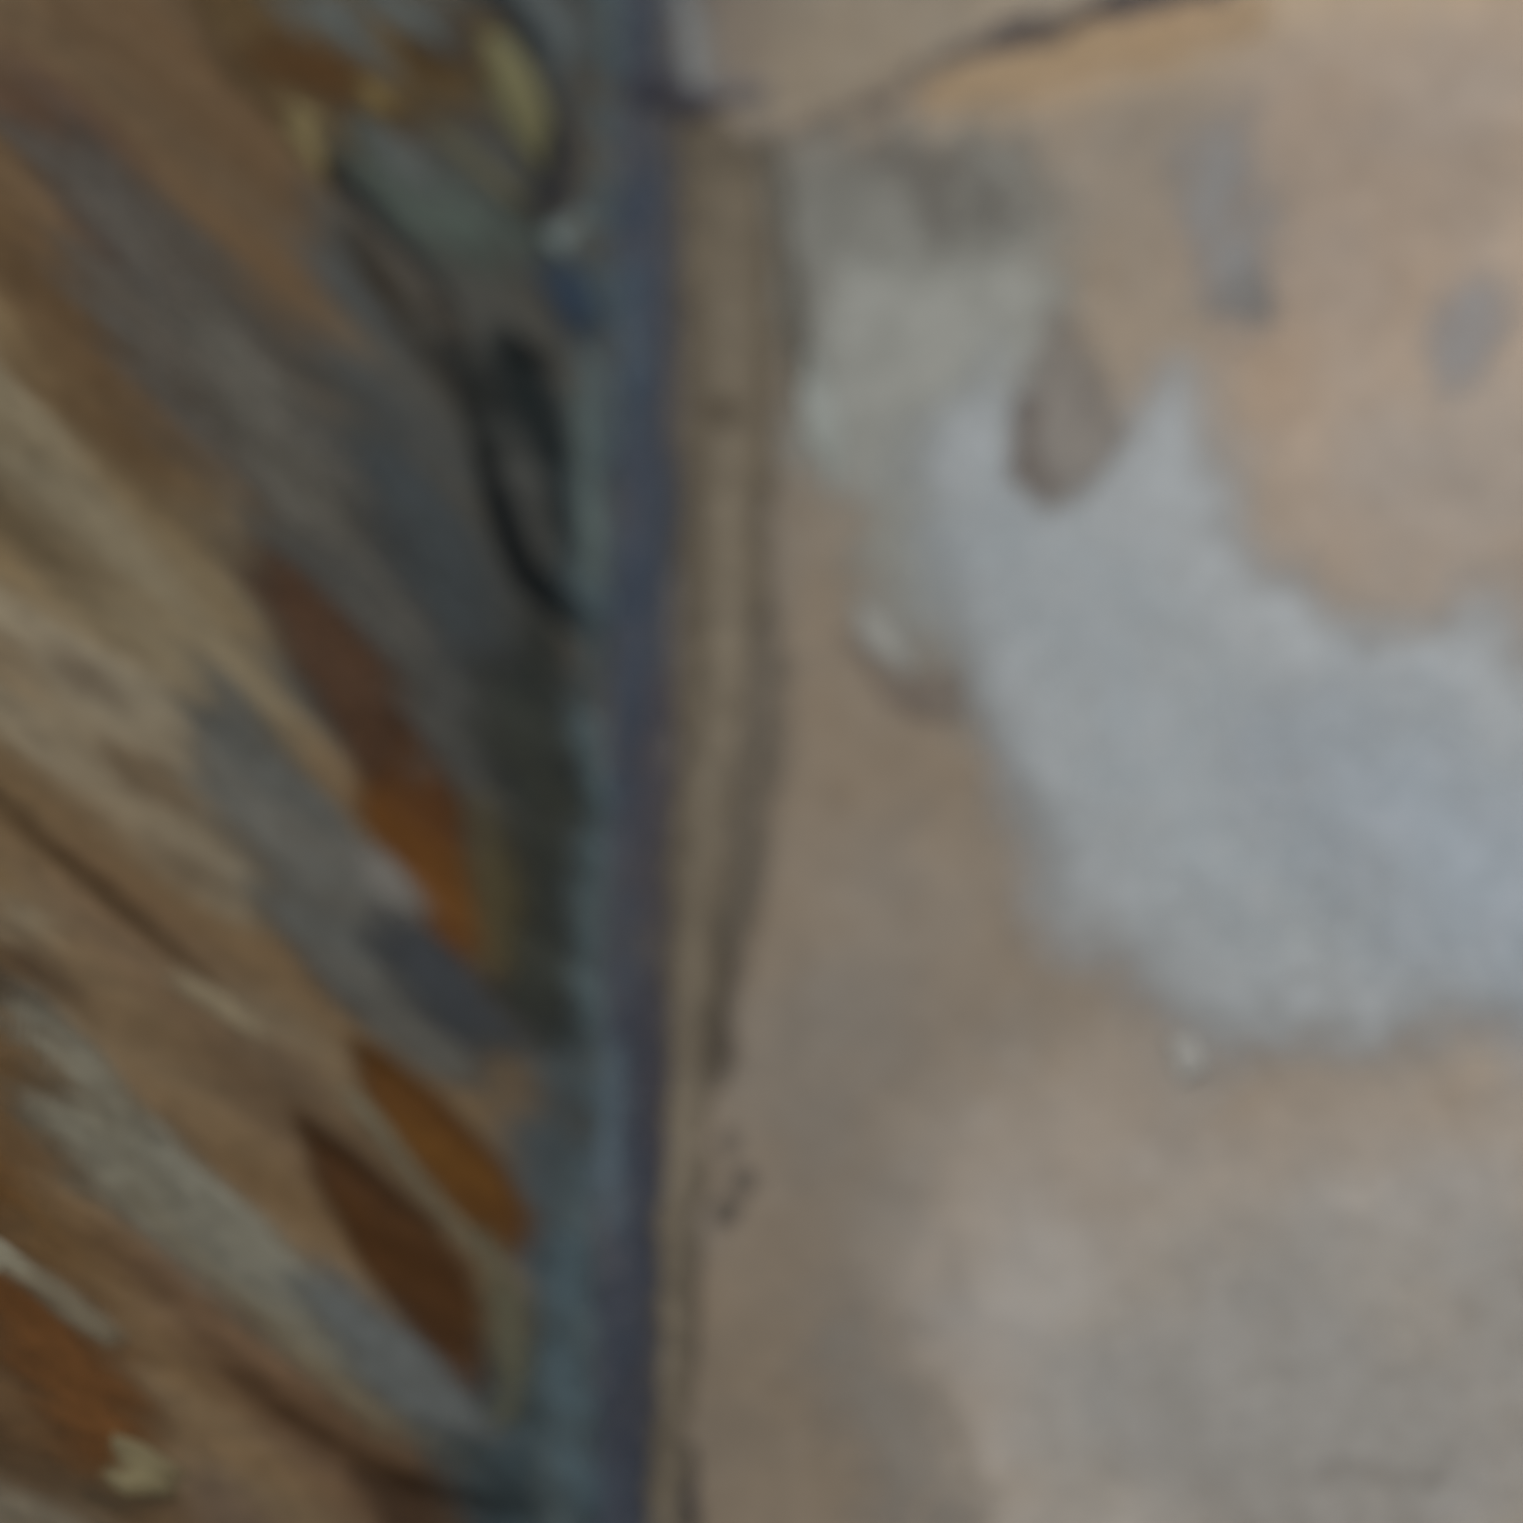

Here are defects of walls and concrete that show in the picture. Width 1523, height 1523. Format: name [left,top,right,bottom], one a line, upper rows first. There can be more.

crack [629,72,765,119]
crack [812,0,1180,130]
water stain [763,131,1523,1082]
peeling [0,1238,118,1342]
spalling [302,1042,530,1419]
corrosion [0,1269,146,1523]
peeling [101,1434,177,1496]